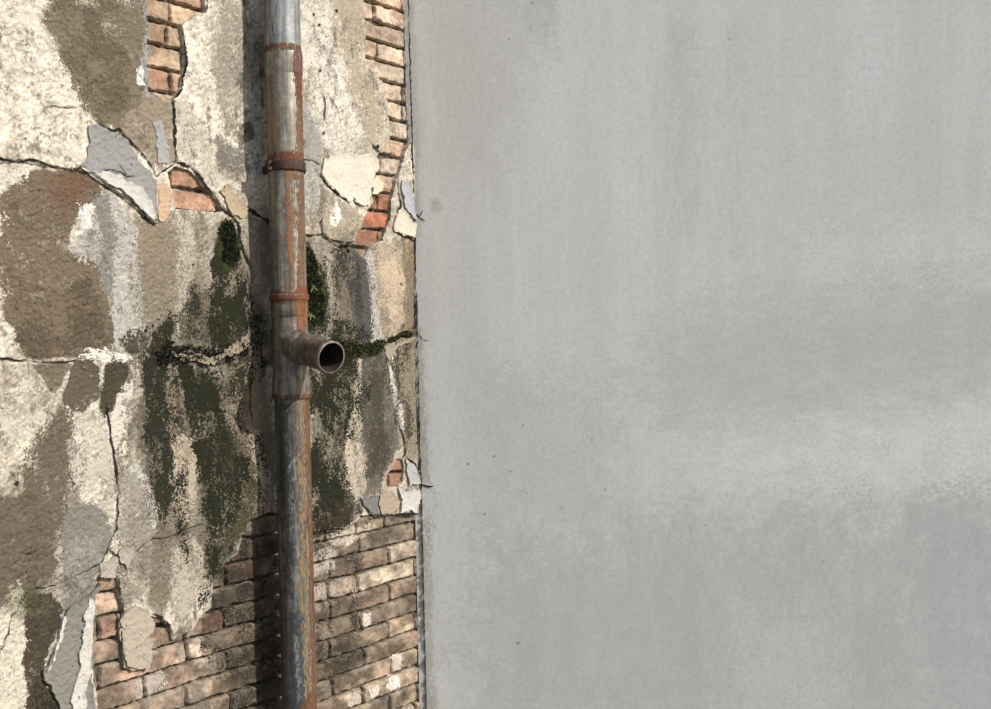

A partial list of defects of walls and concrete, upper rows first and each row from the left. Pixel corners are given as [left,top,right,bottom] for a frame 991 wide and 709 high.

crack [0,27,269,330]
peeling [80,120,248,222]
spalling [145,0,202,101]
corrosion [264,42,309,331]
spalling [320,0,417,257]
crack [0,356,84,364]
leakage [0,0,629,709]
crack [0,407,202,666]
spalling [41,512,282,709]
corrosion [272,394,317,709]
spalling [313,459,421,709]